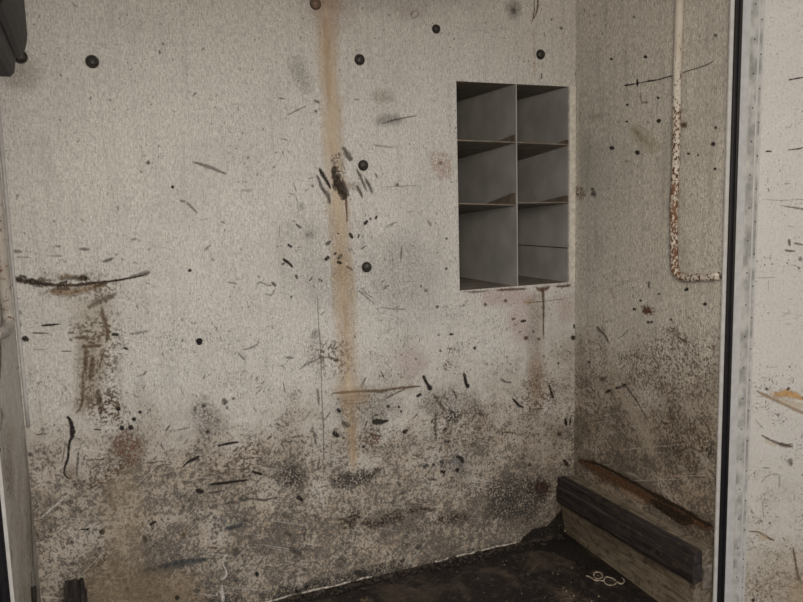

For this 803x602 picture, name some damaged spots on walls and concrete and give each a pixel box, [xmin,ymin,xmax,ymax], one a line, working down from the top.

rust [52,274,142,487]
water stain [196,479,247,494]
water stain [362,508,469,528]
water stain [143,558,206,574]
water stain [271,542,540,602]